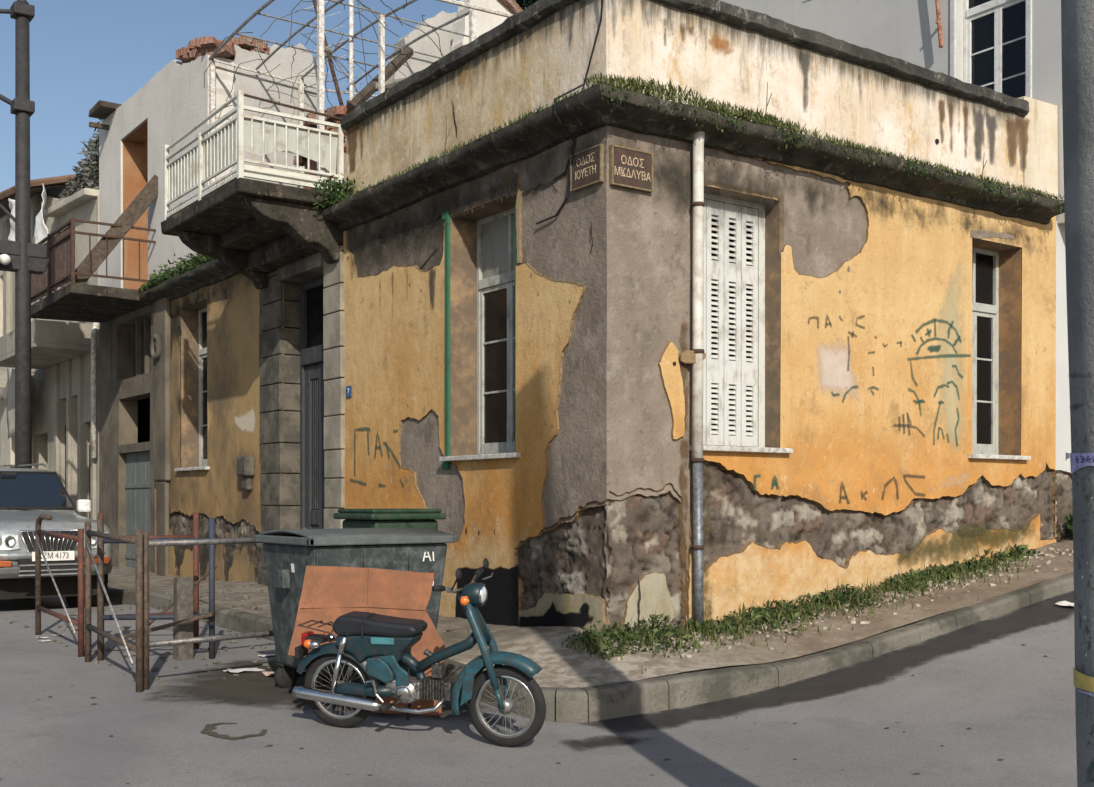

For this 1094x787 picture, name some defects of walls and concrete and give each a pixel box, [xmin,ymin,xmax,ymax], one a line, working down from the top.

damp [801,51,810,107]
damp [974,109,997,164]
peeling [346,126,1073,632]